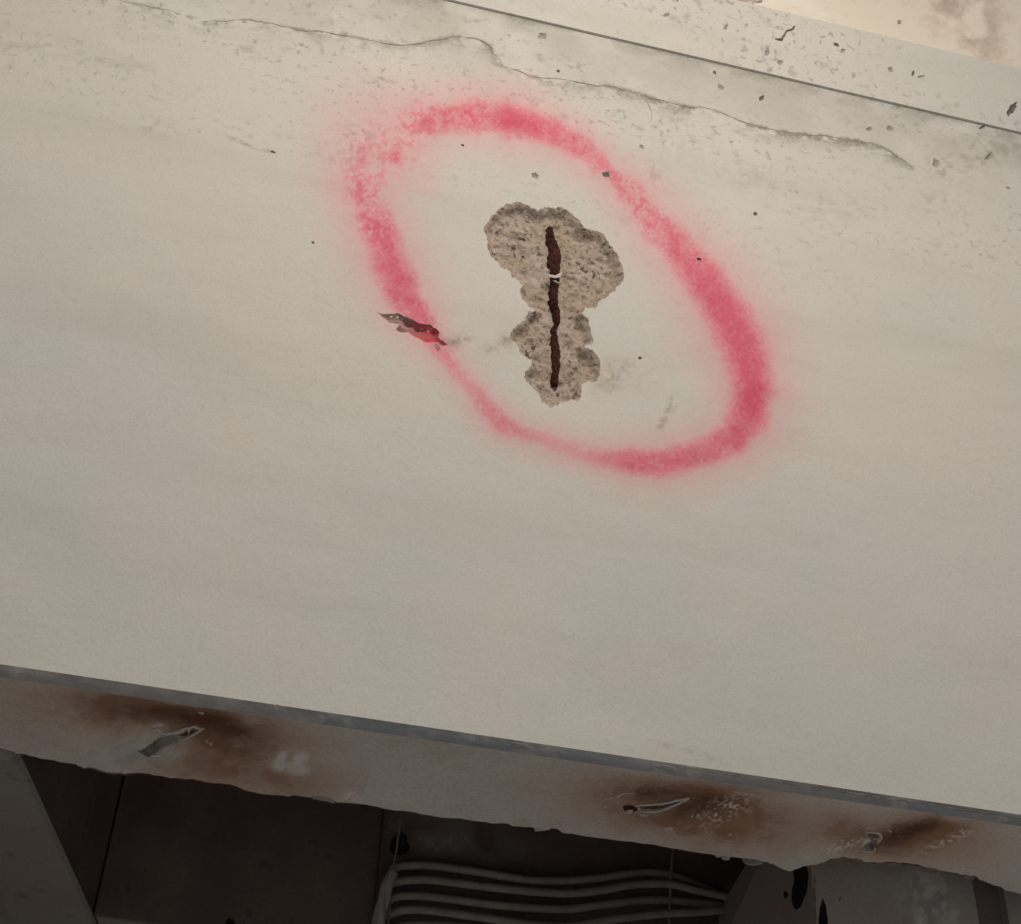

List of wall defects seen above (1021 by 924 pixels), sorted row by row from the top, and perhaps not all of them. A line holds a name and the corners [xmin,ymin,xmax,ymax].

crack [121,0,913,169]
spalling [484,201,624,408]
corrosion [45,688,334,796]
corrosion [581,778,793,847]
corrosion [813,814,979,859]